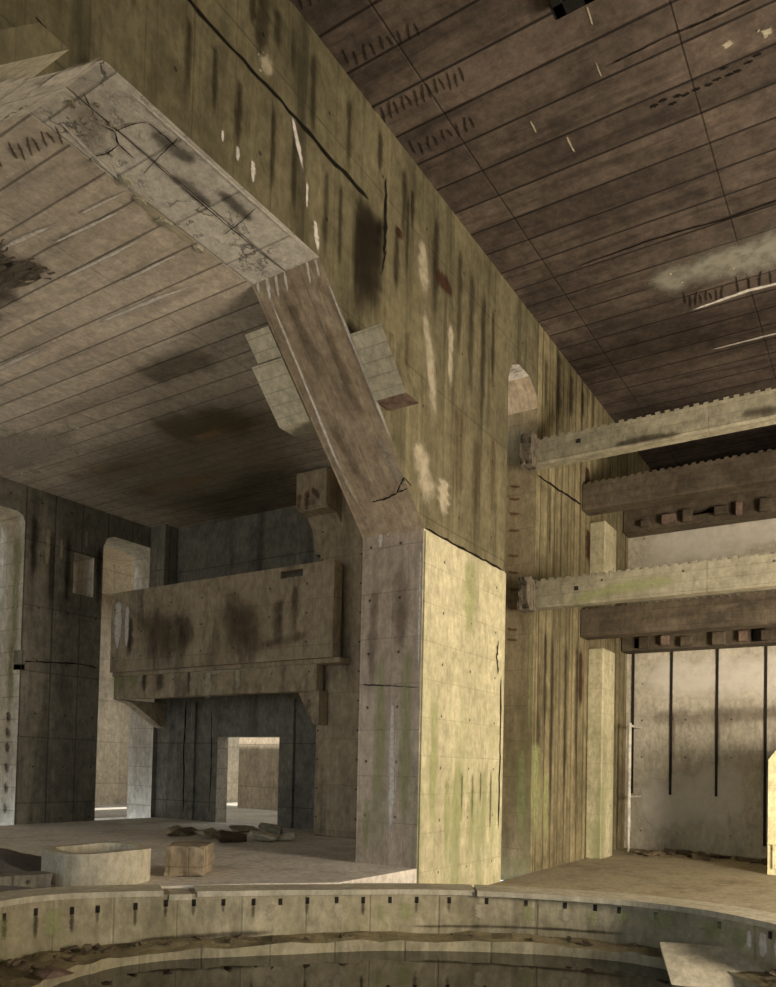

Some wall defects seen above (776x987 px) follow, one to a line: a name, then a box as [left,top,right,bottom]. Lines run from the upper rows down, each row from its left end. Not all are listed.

crack [80,93,283,270]
crack [188,0,388,272]
damp [257,271,340,468]
damp [292,119,308,206]
damp [306,220,326,284]
damp [329,286,388,432]
damp [696,283,776,309]